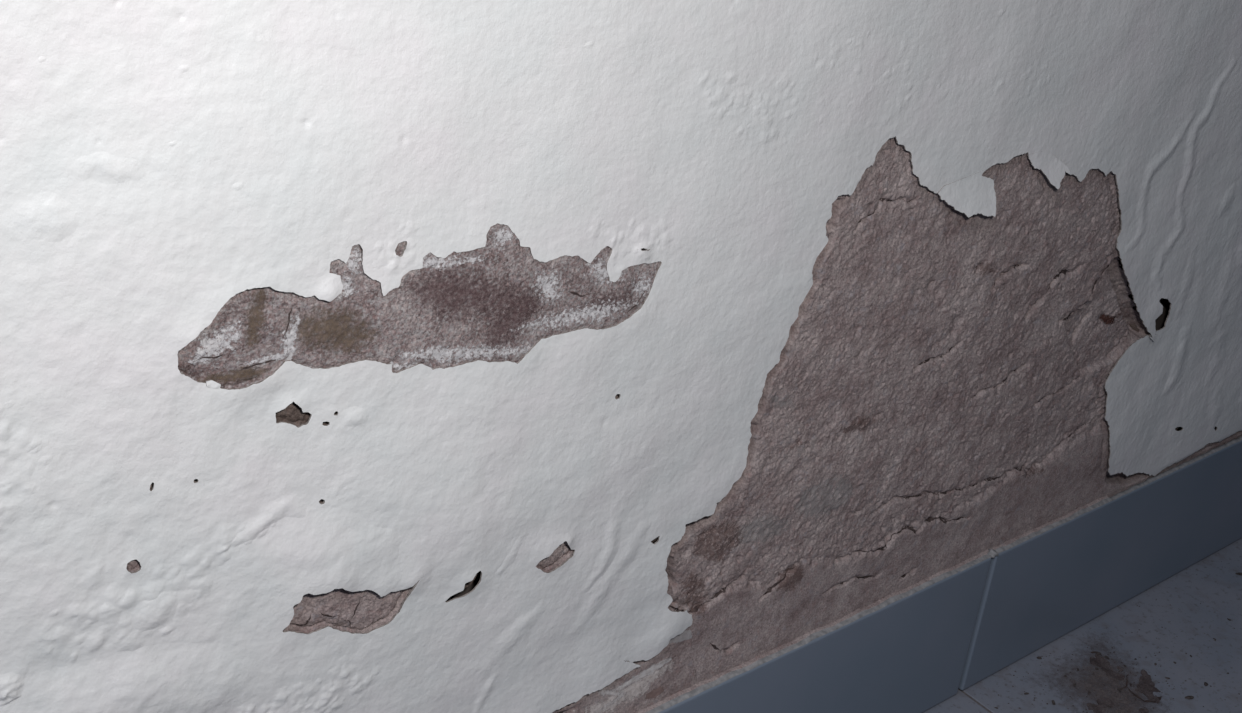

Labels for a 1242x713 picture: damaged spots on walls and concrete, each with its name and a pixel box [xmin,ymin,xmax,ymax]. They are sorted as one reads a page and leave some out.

peeling [177,223,660,389]
peeling [276,402,311,427]
peeling [552,137,1242,713]
peeling [536,541,574,572]